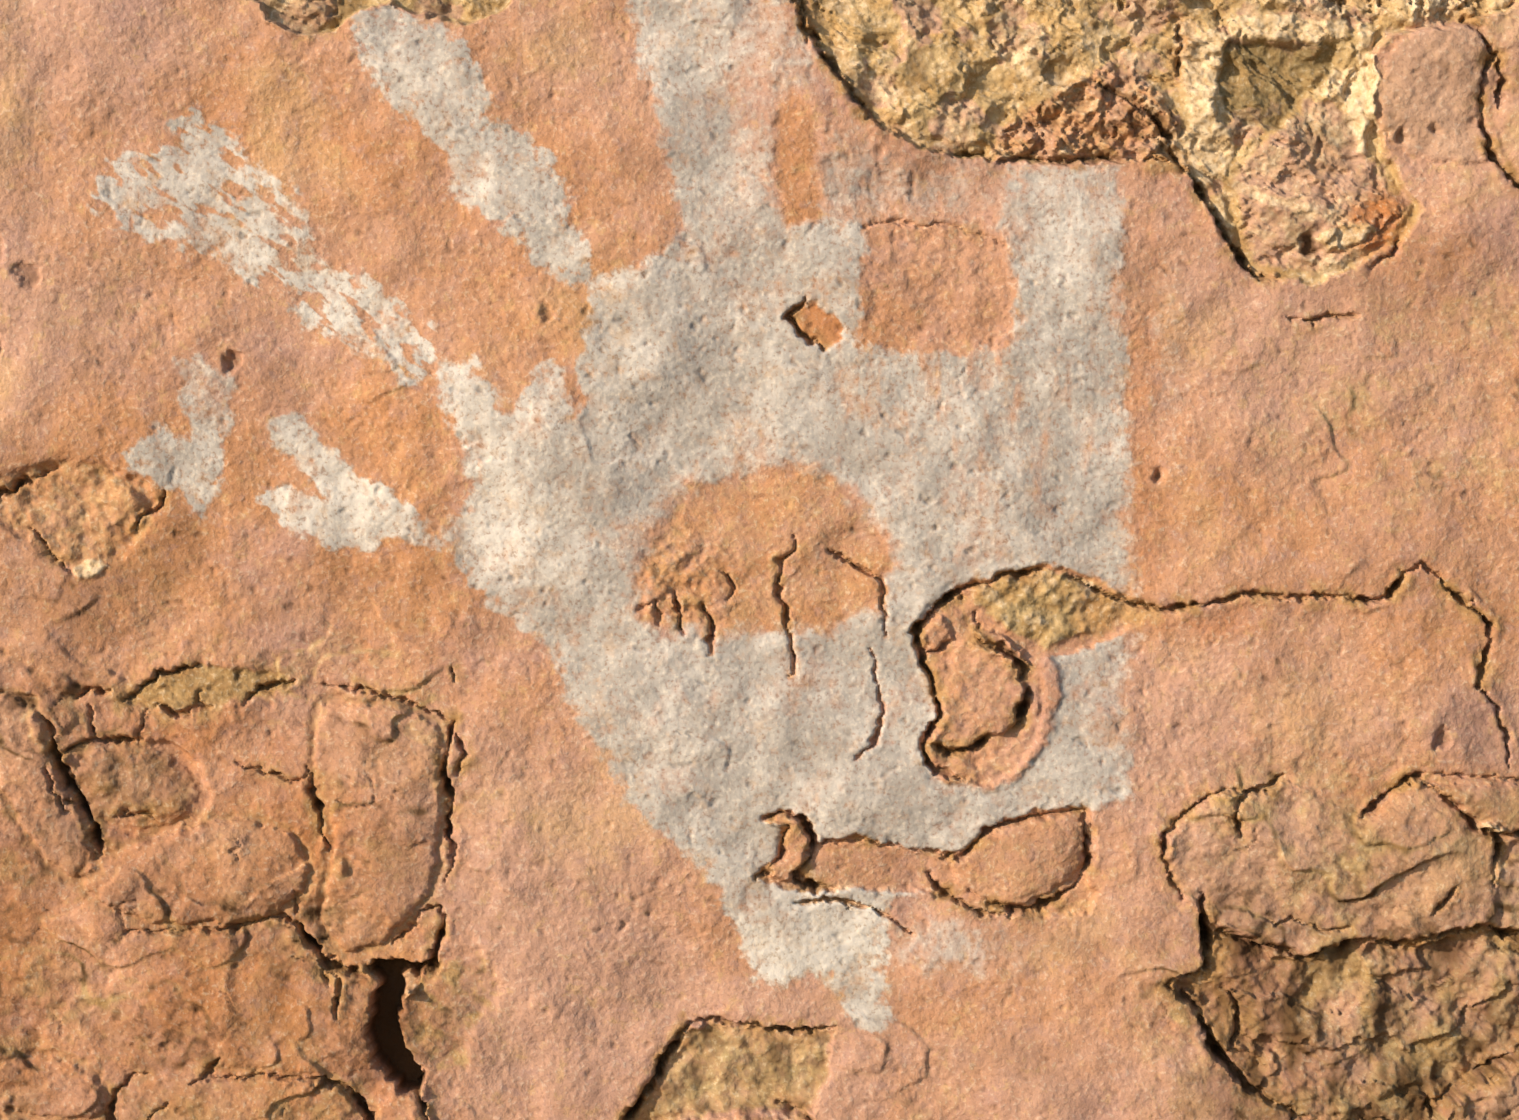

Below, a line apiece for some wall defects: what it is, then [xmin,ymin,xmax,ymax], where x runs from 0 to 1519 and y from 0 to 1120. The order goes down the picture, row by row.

flaking render [246,0,518,40]
flaking render [774,88,827,233]
flaking render [796,0,1519,287]
flaking render [0,456,162,578]
flaking render [911,562,1145,790]
crack [41,662,471,1020]
crack [621,536,1519,1120]
crack [105,1058,378,1120]
crack [416,1076,431,1120]
flaking render [633,1023,838,1120]
flaking render [1173,923,1519,1120]